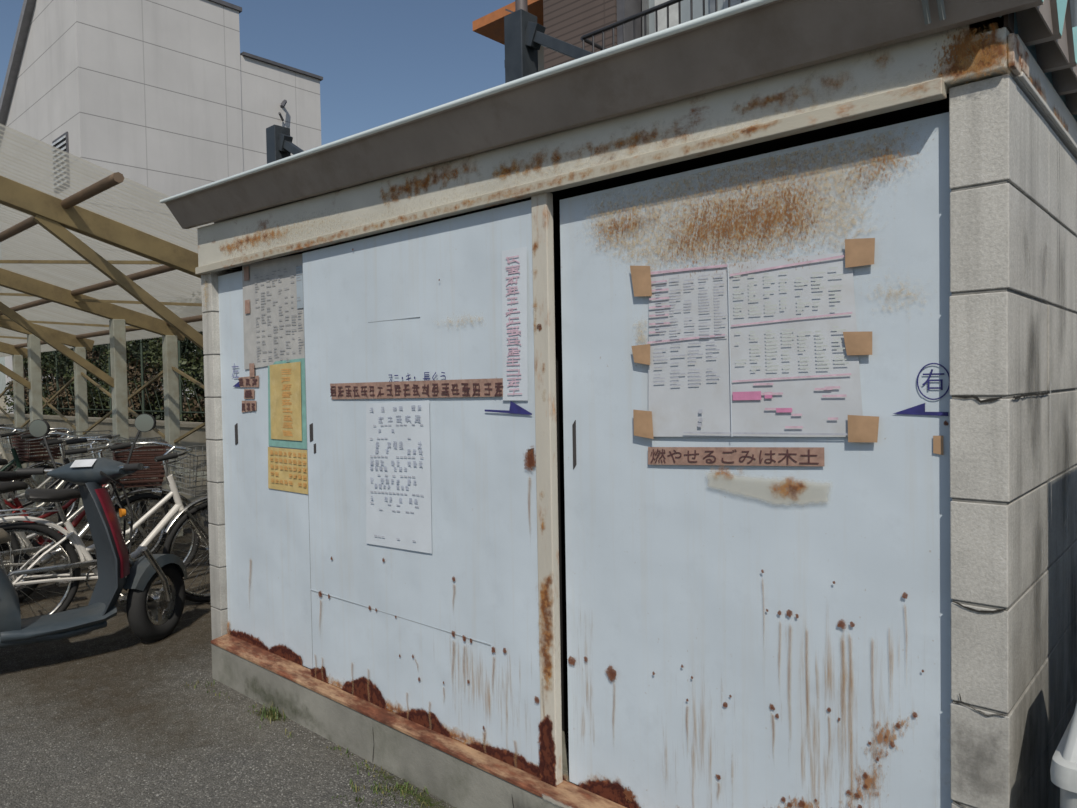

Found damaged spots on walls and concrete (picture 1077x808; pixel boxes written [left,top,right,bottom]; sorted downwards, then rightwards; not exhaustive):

rust [931,24,1008,77]
rust [493,154,561,177]
rust [591,136,913,276]
crack [951,392,1050,403]
rust [534,577,553,704]
rust [227,622,641,808]
rust [781,796,819,808]
rust [846,712,918,808]